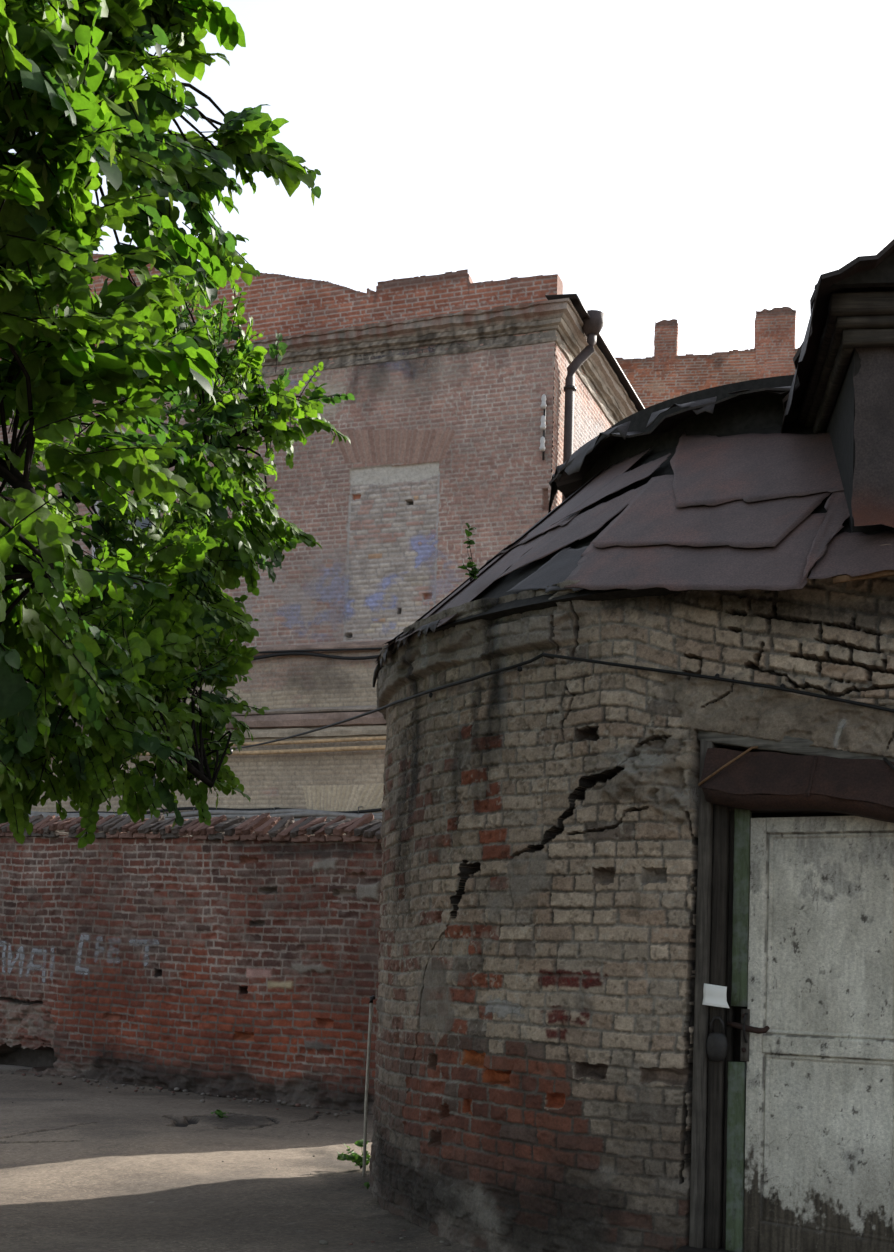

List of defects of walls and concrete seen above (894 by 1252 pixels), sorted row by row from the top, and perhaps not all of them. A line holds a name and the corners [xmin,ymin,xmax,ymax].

rust [853,515,894,527]
crack [682,596,894,708]
crack [886,728,894,750]
crack [402,734,672,1119]
spalling [0,987,57,1072]
peeling [761,1171,894,1244]